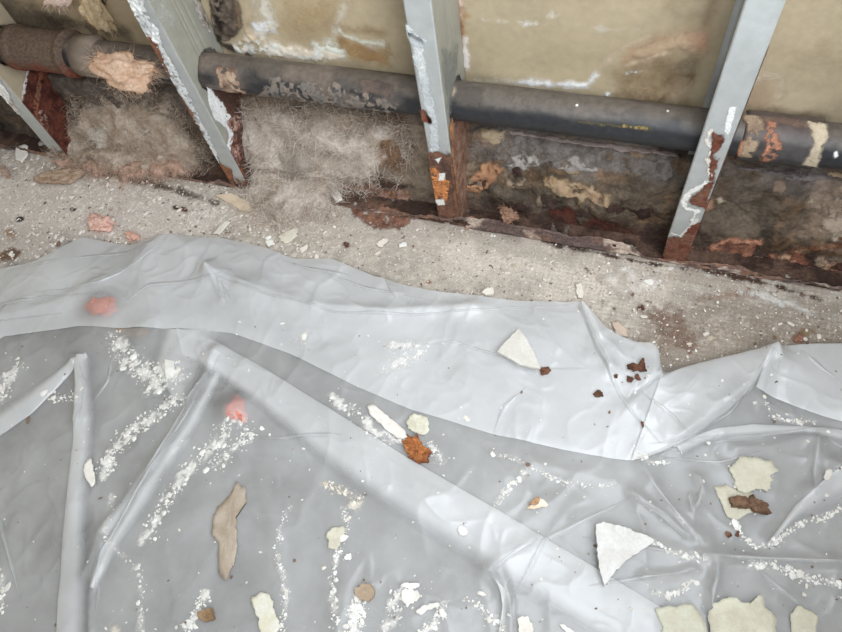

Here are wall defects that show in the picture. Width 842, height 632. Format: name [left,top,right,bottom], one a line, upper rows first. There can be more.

water stain [0,0,95,31]
water stain [209,0,387,63]
rust [21,70,73,156]
spalling [480,128,505,145]
rust [655,45,842,271]
spalling [466,160,653,224]
rust [549,207,634,235]